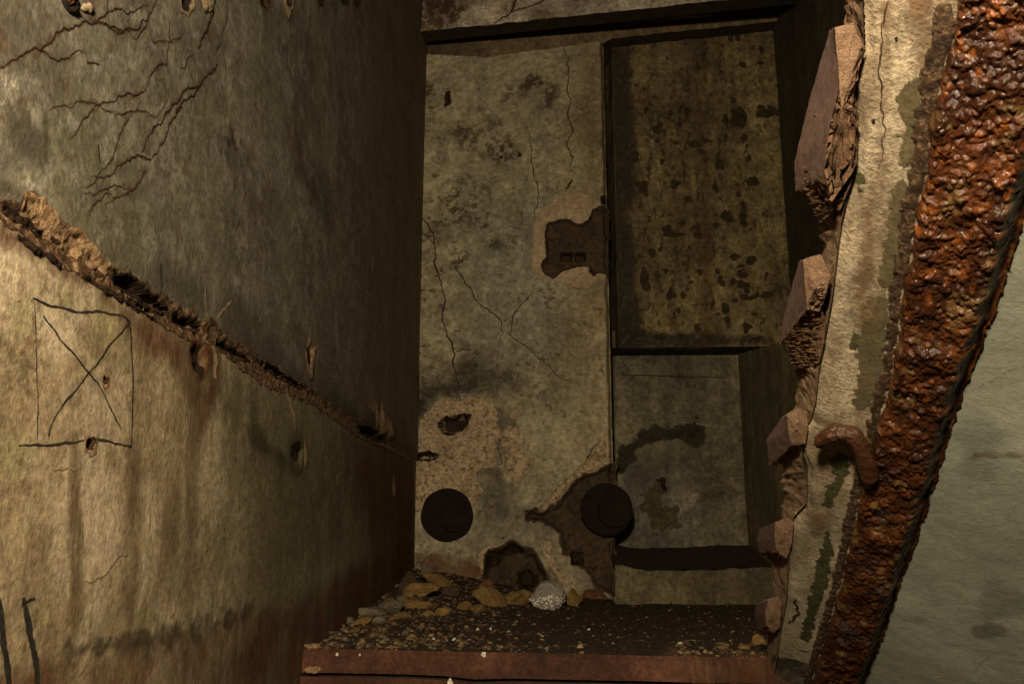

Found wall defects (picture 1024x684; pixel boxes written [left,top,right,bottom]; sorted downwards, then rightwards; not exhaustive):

crack [0,0,227,220]
crack [508,133,539,233]
crack [564,51,573,189]
spalling [531,190,610,289]
water stain [606,55,772,348]
peeling [639,177,759,292]
spalling [0,191,316,472]
crack [422,218,580,402]
spalling [415,397,534,512]
water stain [613,416,705,474]
peeling [814,424,879,485]
spalling [478,459,618,596]